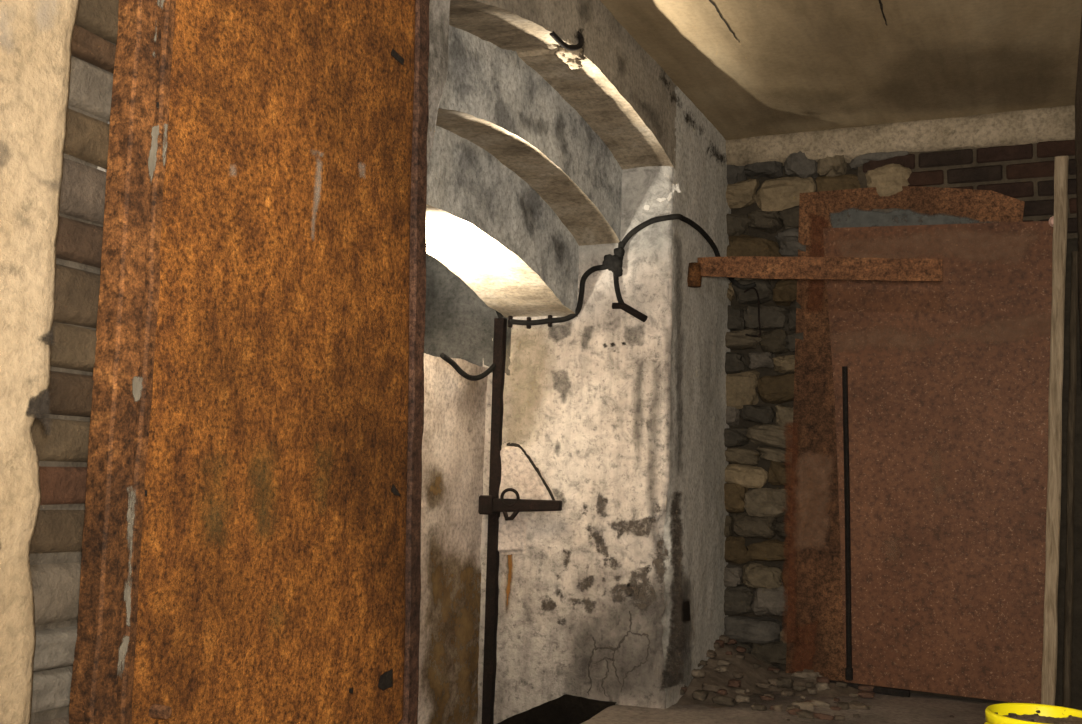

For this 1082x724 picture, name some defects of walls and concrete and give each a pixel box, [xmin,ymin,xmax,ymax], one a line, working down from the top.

crack [709,0,739,41]
crack [878,0,887,26]
peeling [541,492,690,688]
crack [587,611,650,696]